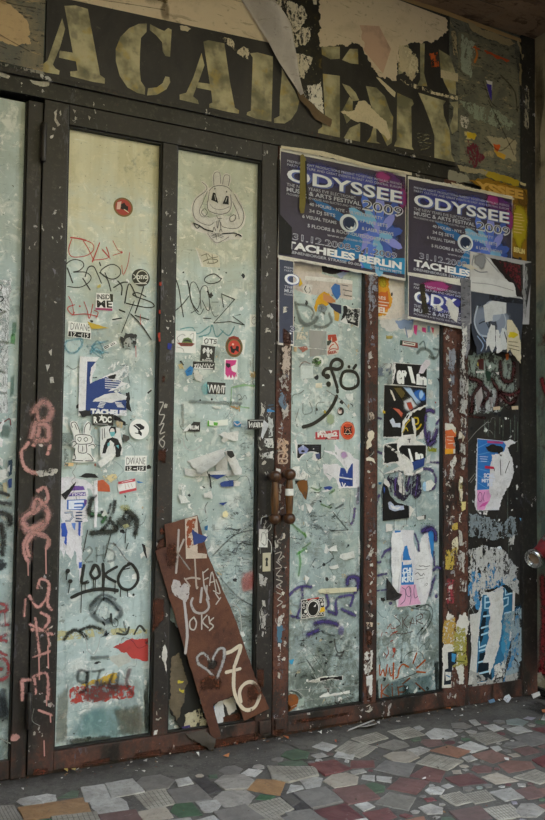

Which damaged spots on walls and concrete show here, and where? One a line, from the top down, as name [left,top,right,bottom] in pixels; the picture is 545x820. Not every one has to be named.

corrosion [152,598,165,631]
corrosion [134,733,260,759]